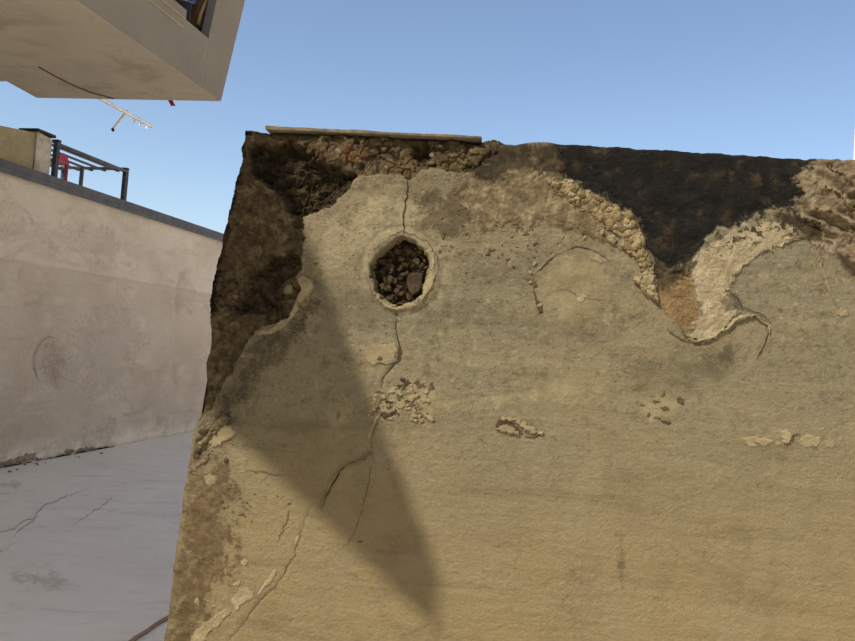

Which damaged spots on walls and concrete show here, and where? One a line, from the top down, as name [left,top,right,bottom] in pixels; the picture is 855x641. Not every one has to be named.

crack [367,277,402,388]
spalling [187,130,855,487]
crack [725,290,769,363]
crack [0,489,87,552]
crack [228,414,380,640]